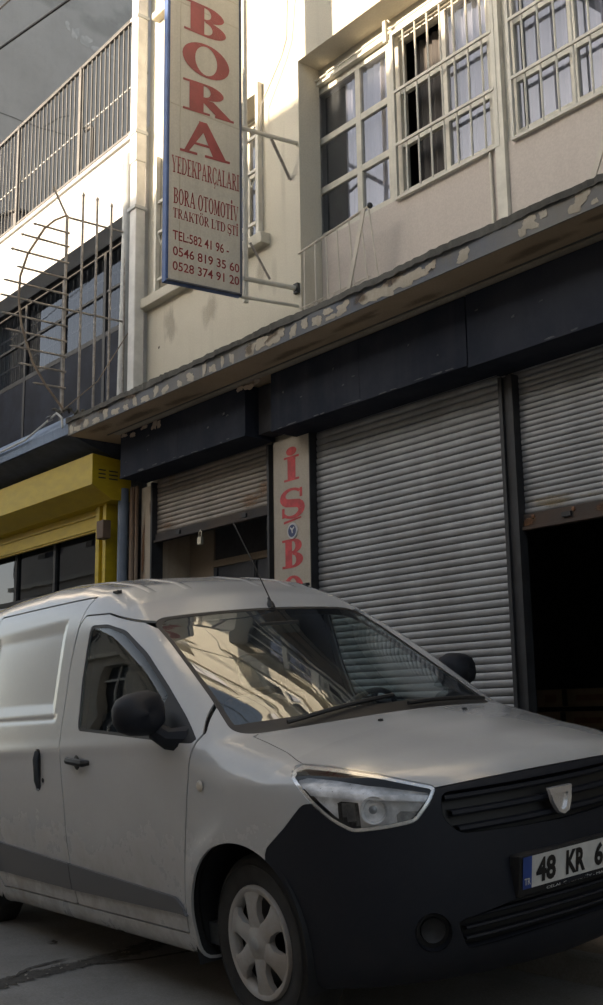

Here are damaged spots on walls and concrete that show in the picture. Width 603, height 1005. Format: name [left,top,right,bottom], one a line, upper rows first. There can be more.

peeling [568,187,599,214]
peeling [518,209,547,237]
peeling [457,246,470,264]
peeling [69,259,436,434]